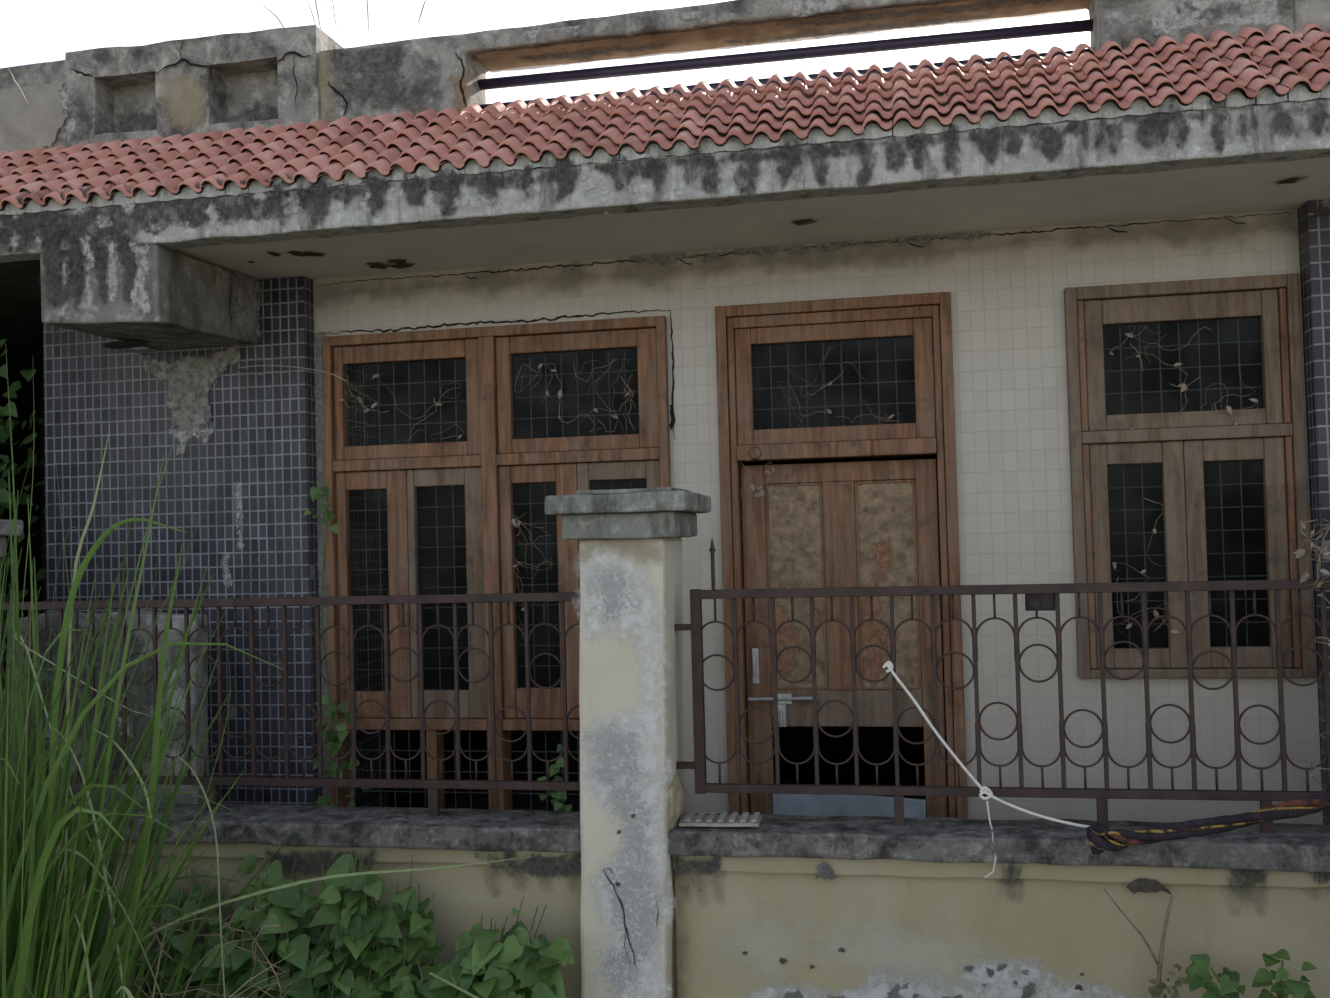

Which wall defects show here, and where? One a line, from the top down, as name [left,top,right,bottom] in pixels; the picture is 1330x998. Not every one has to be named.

crack [156,42,212,74]
crack [275,51,348,116]
water stain [331,47,404,111]
crack [455,53,467,107]
water stain [246,97,1330,229]
water stain [41,232,150,319]
spalling [366,260,414,269]
crack [603,868,659,966]
peeling [749,960,1136,998]